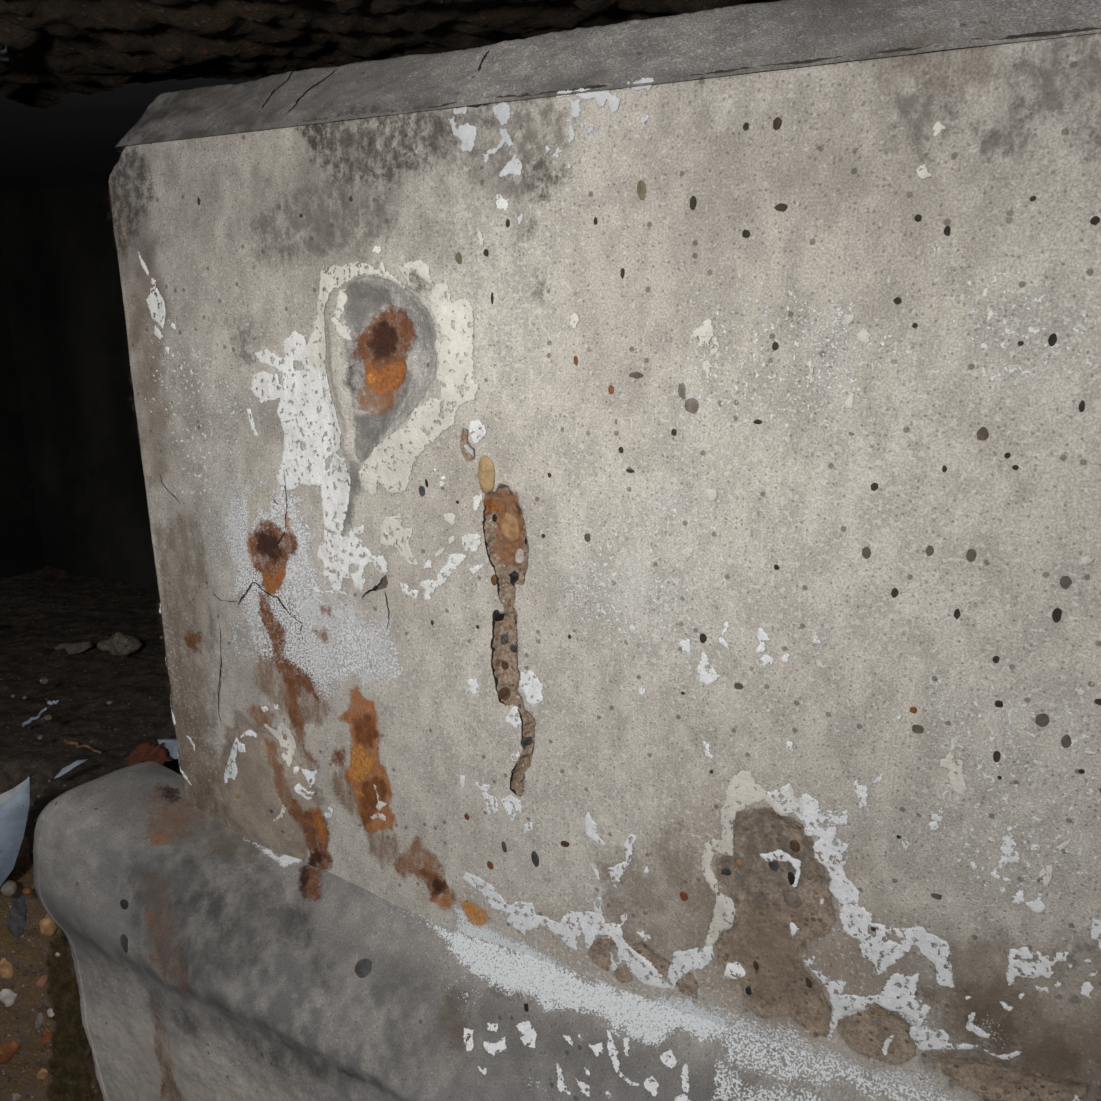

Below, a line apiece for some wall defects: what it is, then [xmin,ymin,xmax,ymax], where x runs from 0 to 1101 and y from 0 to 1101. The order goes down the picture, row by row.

water stain [261,105,489,253]
corrosion [354,306,417,415]
crack [216,633,224,722]
crack [214,582,302,632]
peeling [224,704,317,800]
water stain [243,837,302,867]
corrosion [247,488,332,901]
peeling [247,246,543,834]
corrosion [331,687,488,926]
peeling [923,679,975,830]
water stain [385,907,977,1101]
peeling [463,770,1098,1101]